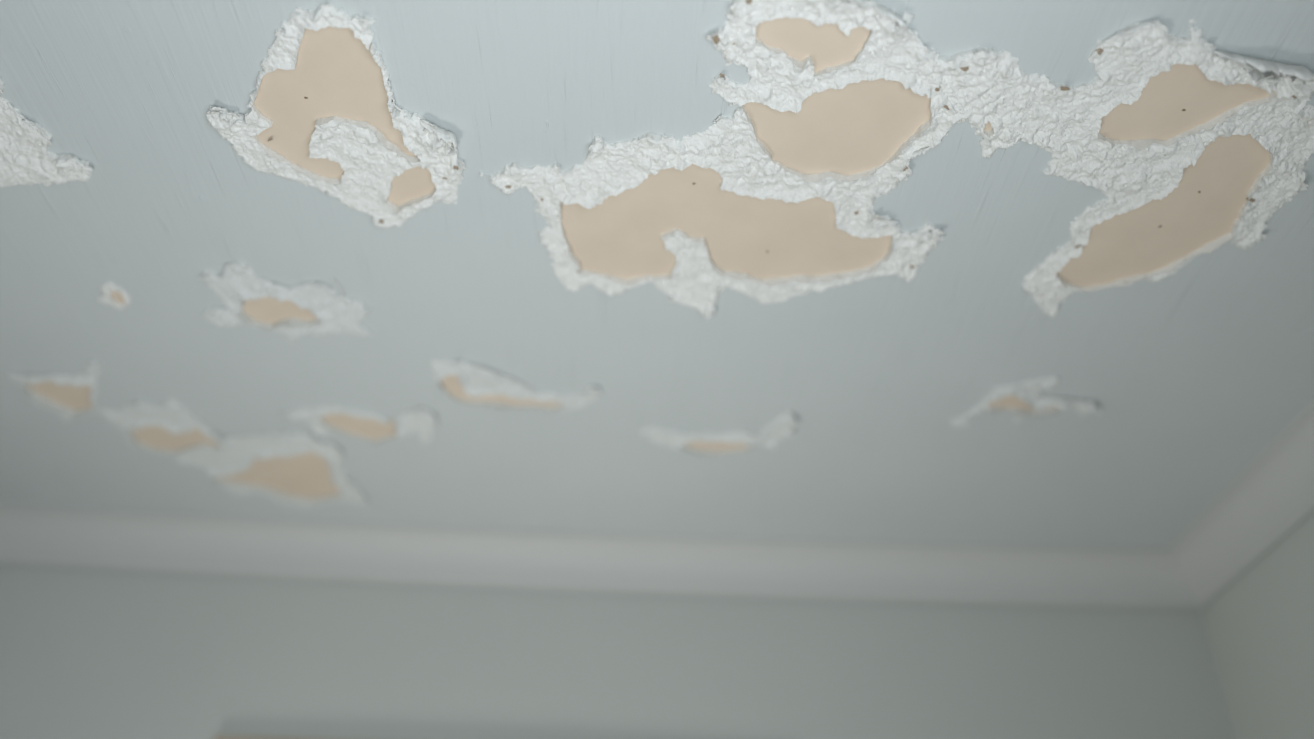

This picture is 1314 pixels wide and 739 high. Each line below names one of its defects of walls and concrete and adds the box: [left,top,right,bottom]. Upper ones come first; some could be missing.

peeling [0,79,94,187]
peeling [206,0,1314,319]
peeling [198,261,374,343]
peeling [8,359,437,508]
peeling [431,359,602,412]
peeling [640,411,798,457]
peeling [951,376,1101,429]